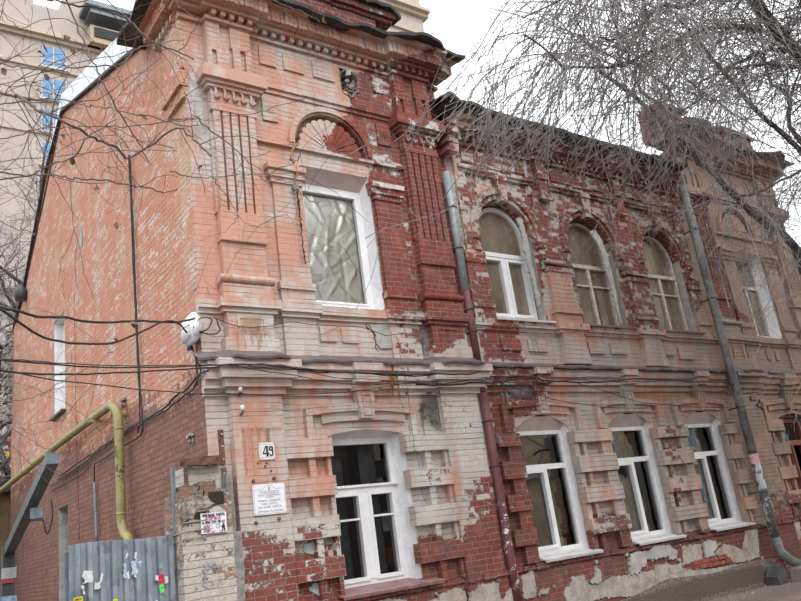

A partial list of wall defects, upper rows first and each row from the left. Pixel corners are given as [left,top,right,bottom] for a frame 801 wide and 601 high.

spalling [179,497,225,523]
spalling [691,543,734,570]